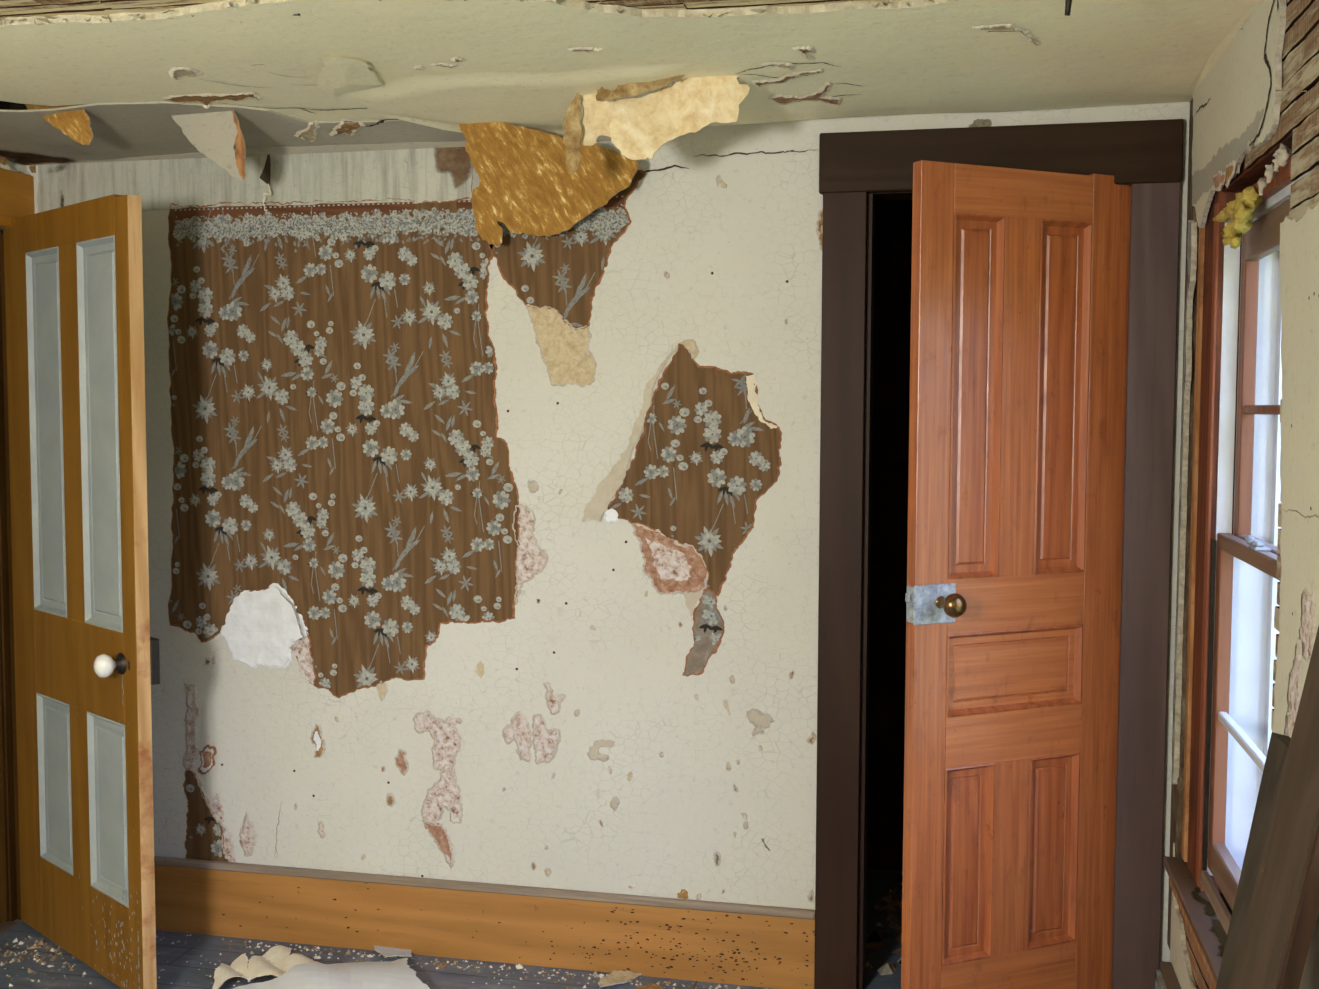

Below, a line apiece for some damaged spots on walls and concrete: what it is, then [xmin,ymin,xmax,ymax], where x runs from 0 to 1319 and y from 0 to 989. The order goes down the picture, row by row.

crack [1249,0,1278,146]
peeling [525,304,597,388]
flaking render [512,504,549,604]
flaking render [631,523,708,617]
flaking render [220,583,309,669]
peeling [1284,588,1316,738]
flaking render [502,682,566,765]
flaking render [723,700,774,736]
flaking render [413,710,463,869]